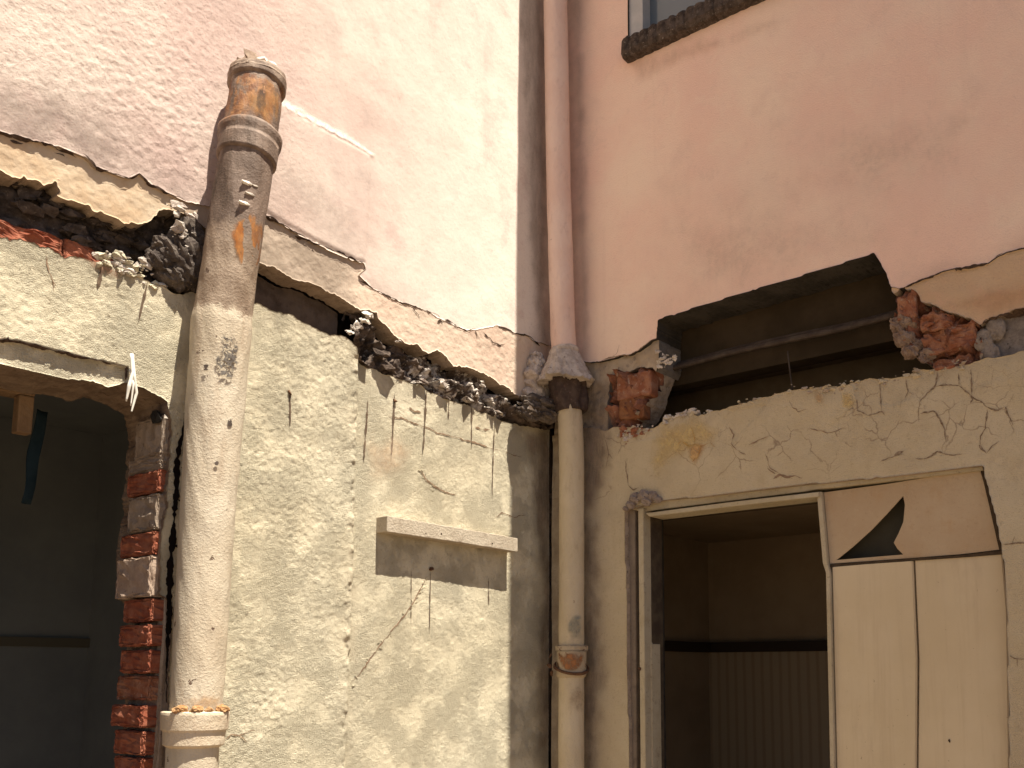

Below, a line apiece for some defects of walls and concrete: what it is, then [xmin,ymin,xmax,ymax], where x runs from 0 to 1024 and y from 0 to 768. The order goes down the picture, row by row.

peeling [238,180,258,206]
flaking render [0,182,205,295]
corrosion [233,218,262,262]
peeling [204,336,238,377]
spalling [254,275,558,430]
spalling [604,350,713,444]
crack [677,427,779,473]
flaking render [774,380,860,394]
crack [789,372,1013,461]
spalling [878,289,1024,385]
crack [165,422,184,703]